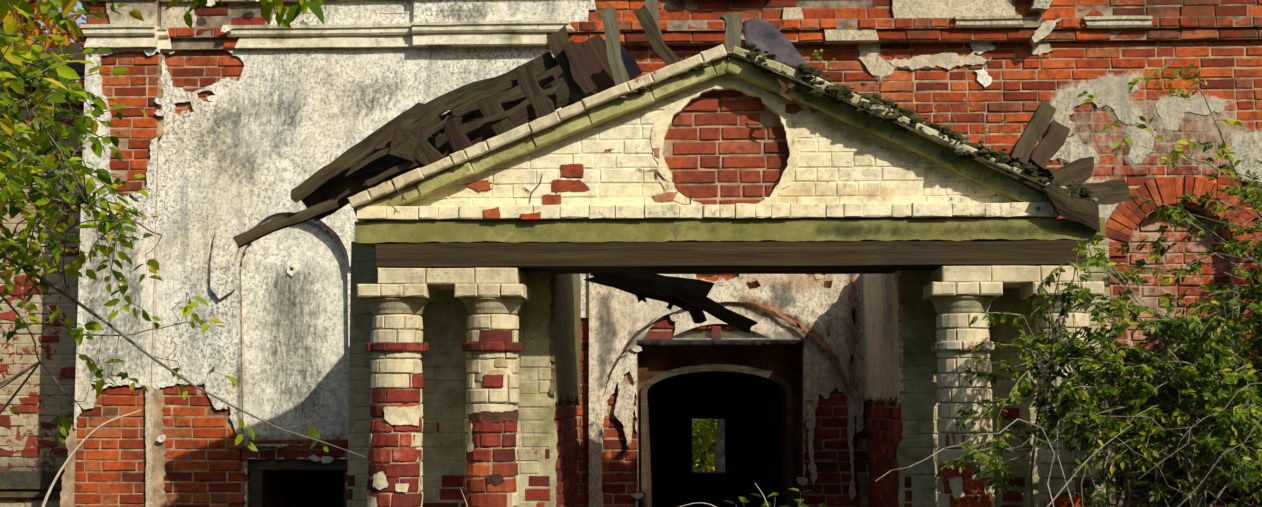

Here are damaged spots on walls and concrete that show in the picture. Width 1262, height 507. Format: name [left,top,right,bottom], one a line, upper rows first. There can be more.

peeling [106,0,158,26]
spalling [99,17,271,195]
peeling [1050,71,1227,183]
peeling [1228,130,1262,184]
peeling [653,190,680,201]
spalling [478,329,512,342]
spalling [630,314,680,353]
peeling [60,366,76,378]
spalling [473,358,508,396]
spalling [0,374,558,507]
spalling [602,373,644,507]
spalling [797,390,870,507]